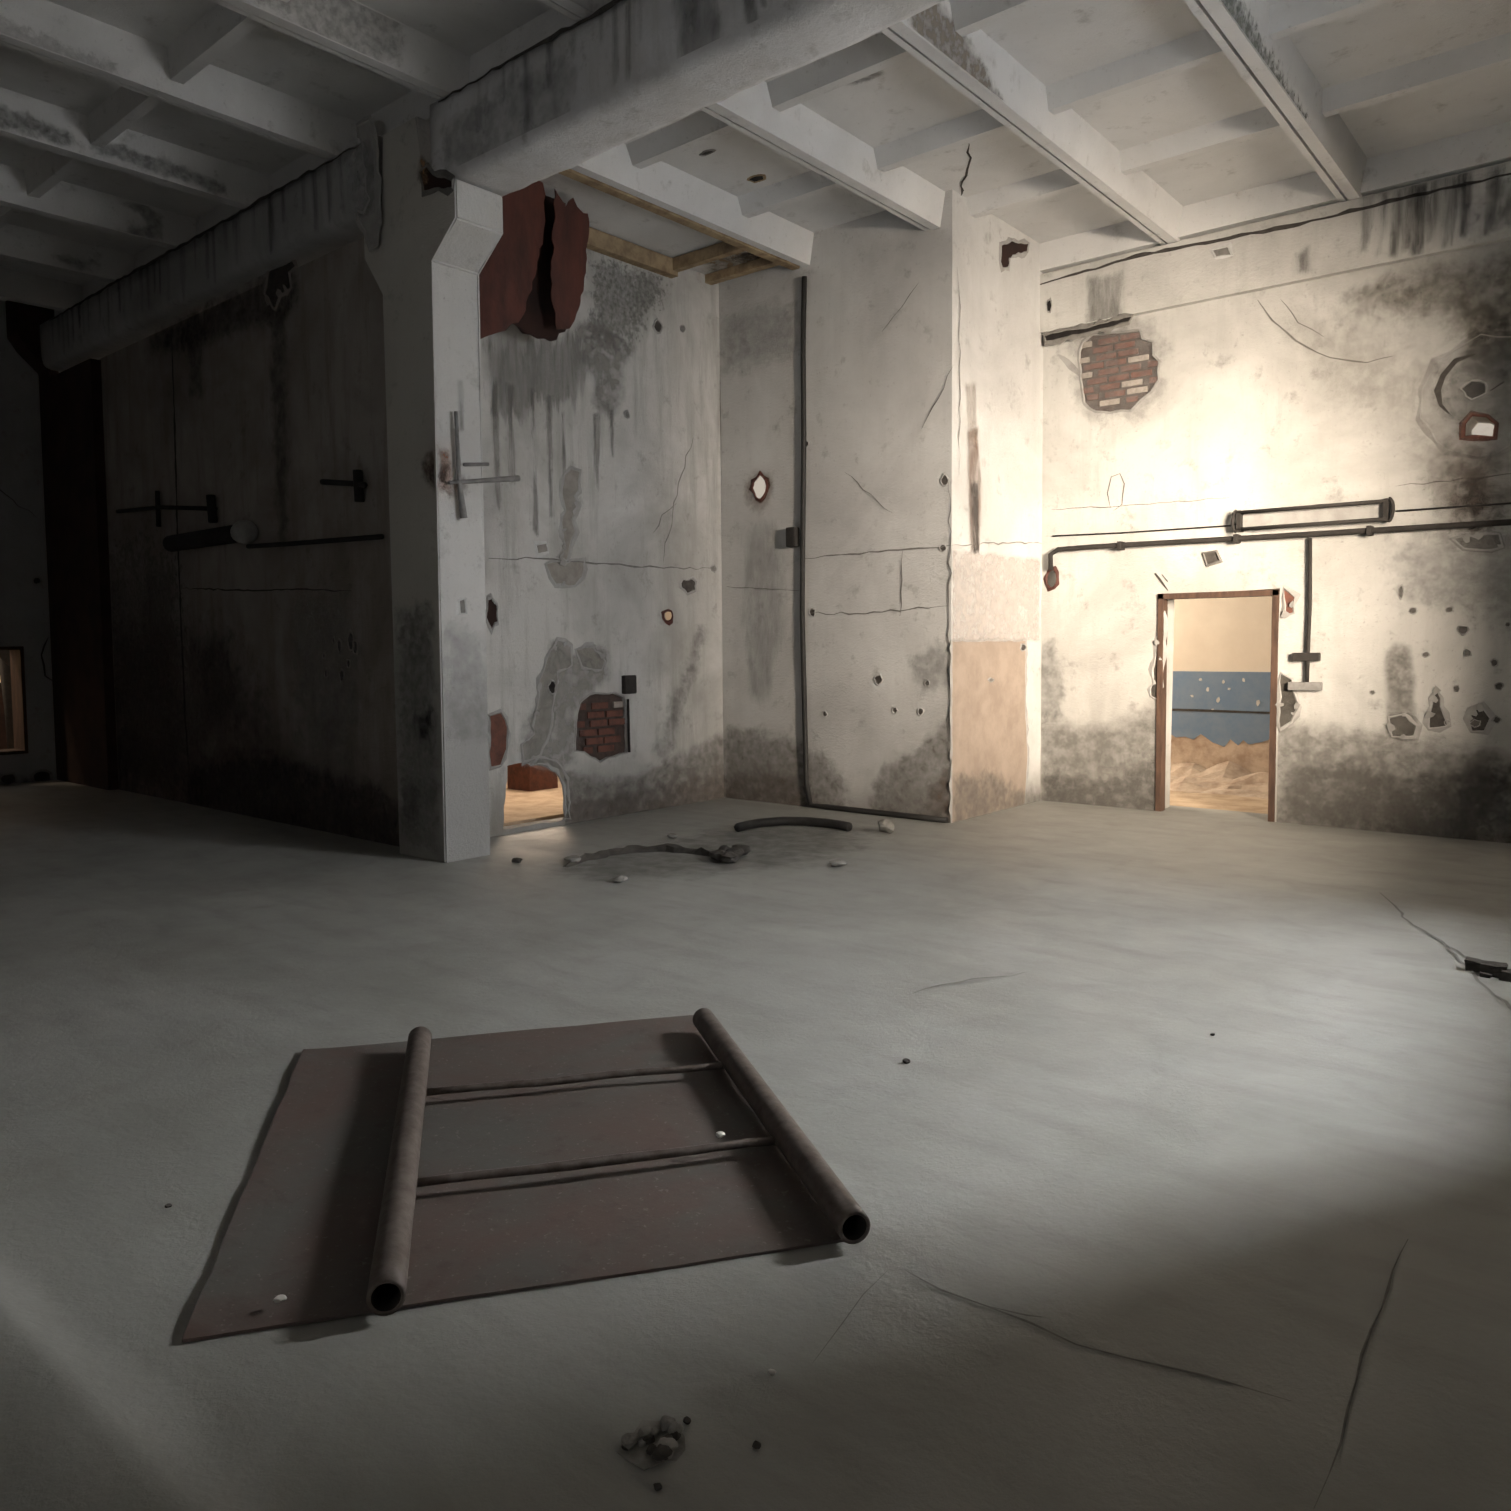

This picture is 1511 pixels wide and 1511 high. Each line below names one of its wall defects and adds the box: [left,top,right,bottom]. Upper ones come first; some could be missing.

damp [1391,184,1436,255]
damp [489,260,665,458]
flaking render [1043,297,1161,414]
damp [1364,258,1511,362]
damp [534,443,565,530]
flaking render [488,637,628,821]
damp [526,643,842,823]
damp [875,720,1156,823]
damp [1279,650,1511,843]
crack [1380,893,1511,1010]
crack [814,1270,1290,1401]
crack [1313,1239,1408,1509]